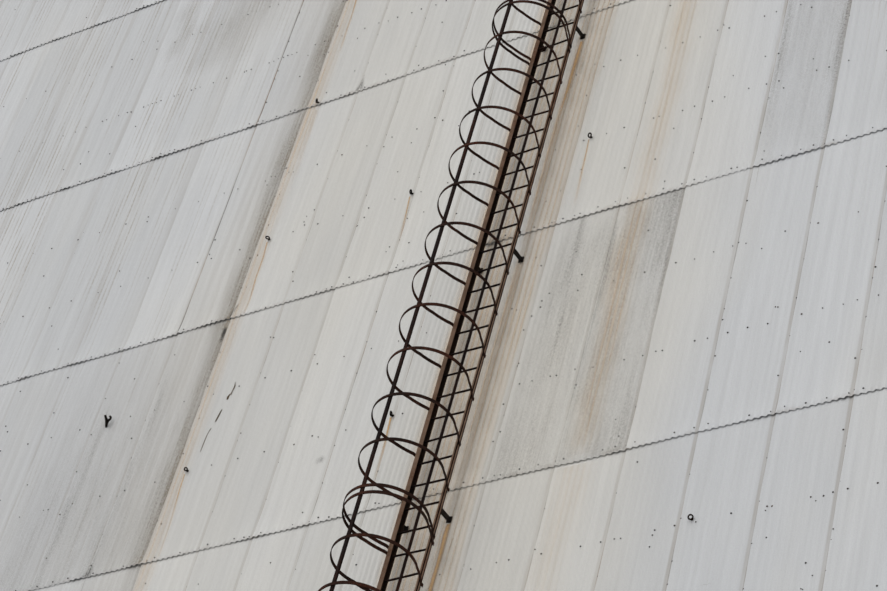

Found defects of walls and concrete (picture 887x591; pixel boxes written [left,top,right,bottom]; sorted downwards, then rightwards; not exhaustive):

corrosion [563,41,591,104]
corrosion [497,123,541,182]
corrosion [386,200,519,591]